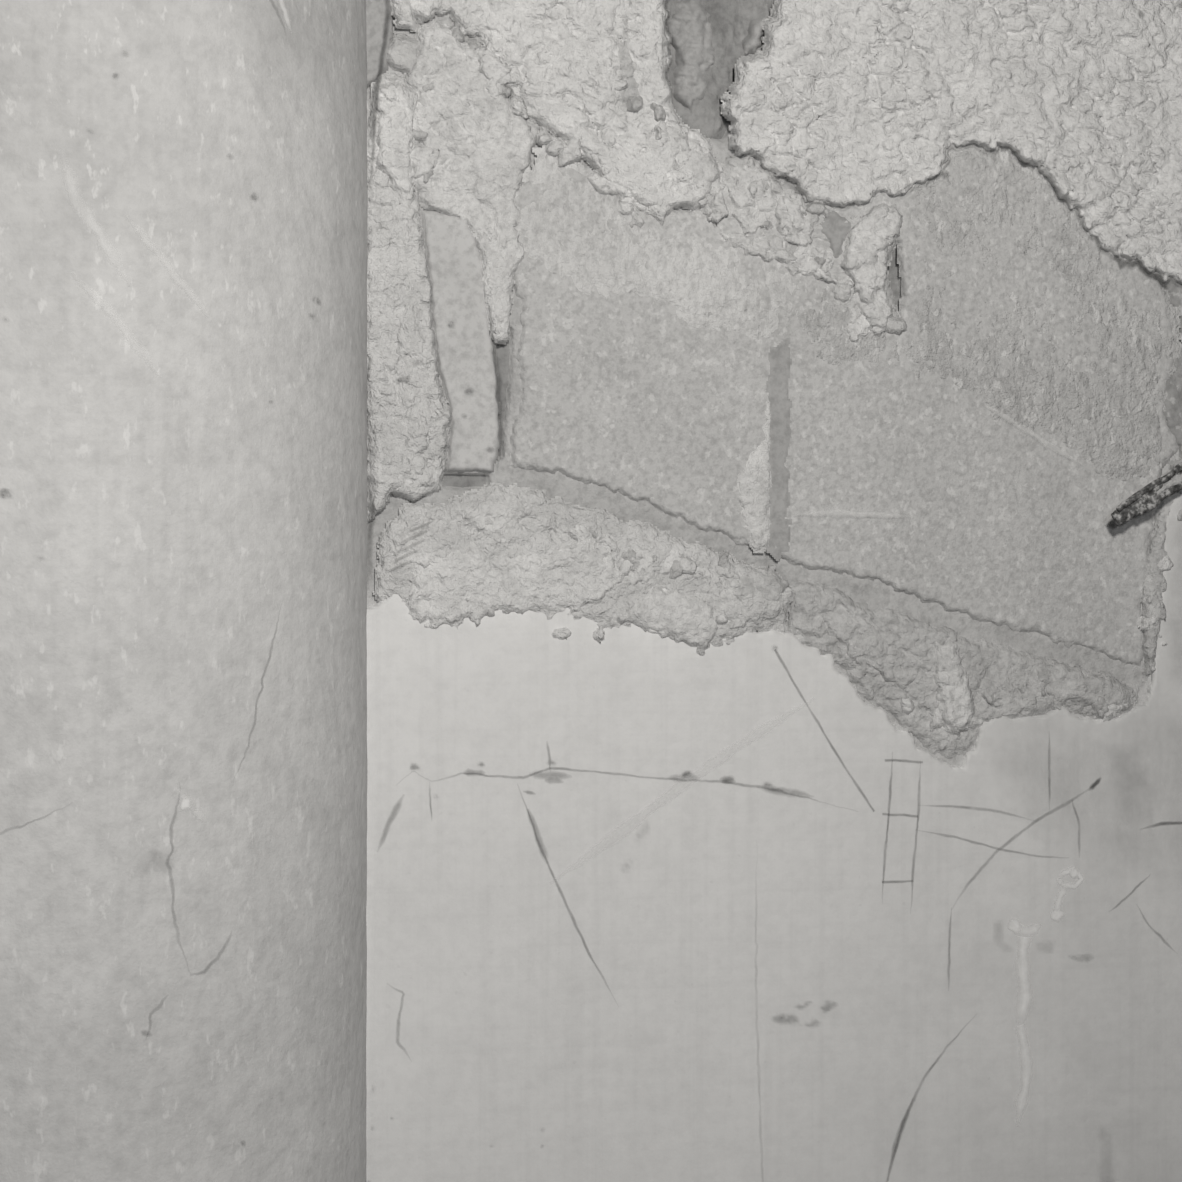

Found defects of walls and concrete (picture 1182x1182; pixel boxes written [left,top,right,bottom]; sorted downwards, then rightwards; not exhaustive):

spalling [366,0,1182,767]
damp [1009,920,1039,1117]